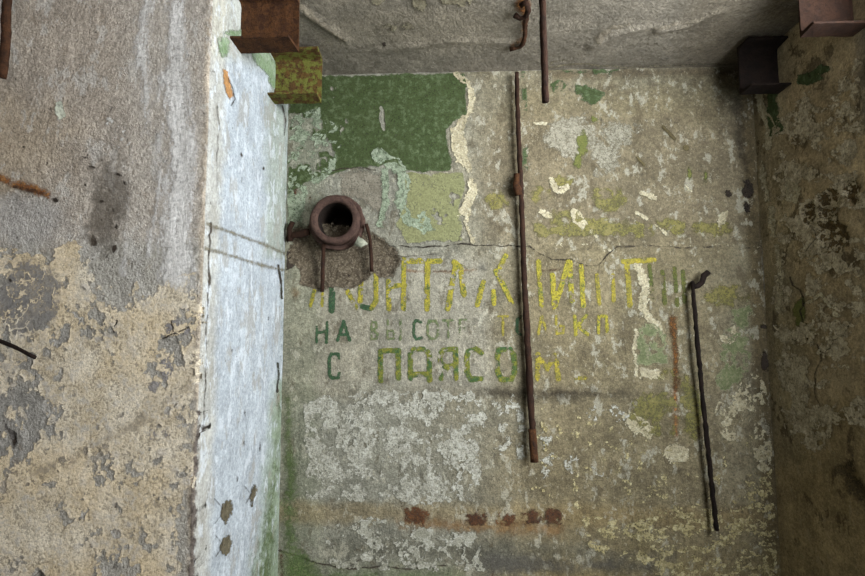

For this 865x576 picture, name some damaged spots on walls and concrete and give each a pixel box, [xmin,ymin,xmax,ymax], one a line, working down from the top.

corrosion [0,174,51,199]
peeling [286,72,509,292]
peeling [0,235,206,576]
peeling [303,388,526,506]
peeling [322,517,485,572]
corrosion [401,506,430,527]
corrosion [465,508,569,528]